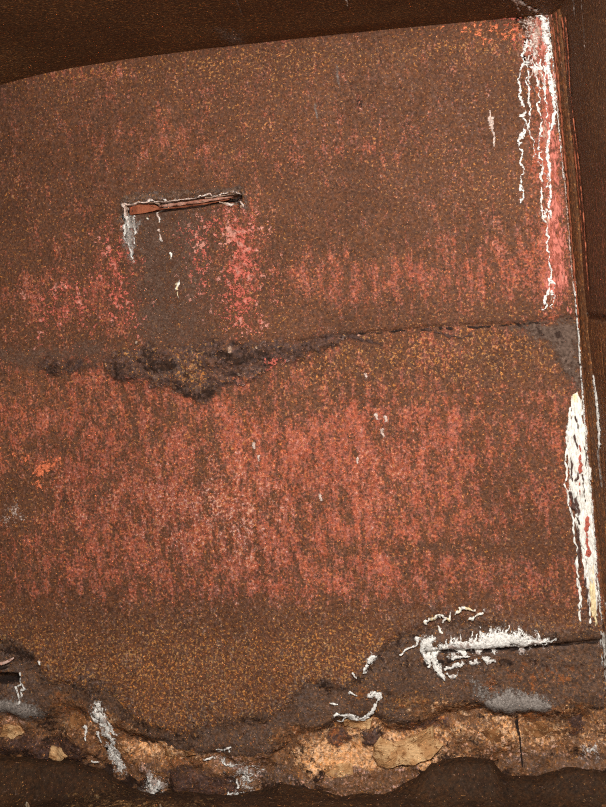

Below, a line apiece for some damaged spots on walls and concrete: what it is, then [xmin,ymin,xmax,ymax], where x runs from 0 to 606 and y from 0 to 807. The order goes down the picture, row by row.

water stain [123,210,208,343]
crack [341,317,572,345]
water stain [503,0,602,626]
water stain [83,701,126,772]
spalling [0,620,606,796]
water stain [399,606,557,681]